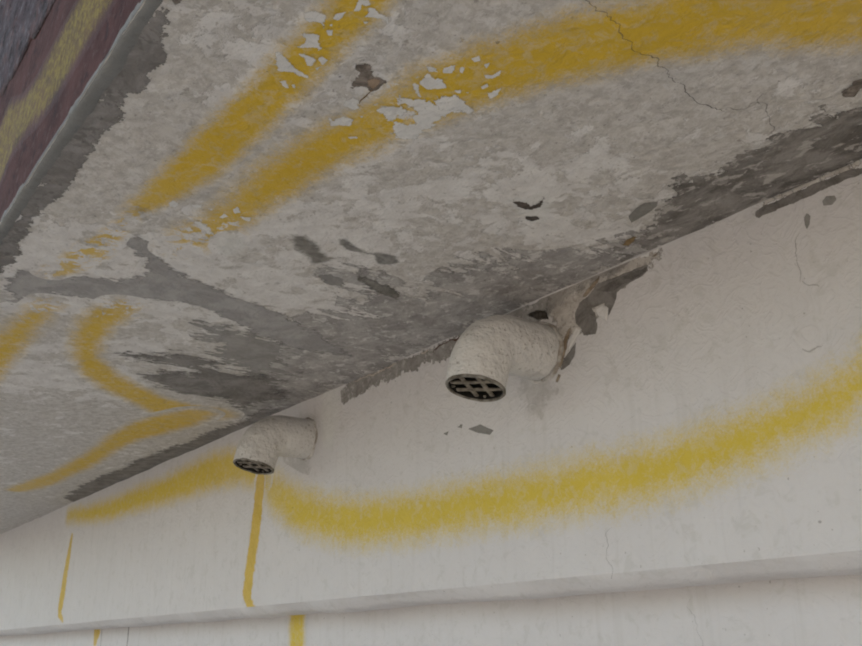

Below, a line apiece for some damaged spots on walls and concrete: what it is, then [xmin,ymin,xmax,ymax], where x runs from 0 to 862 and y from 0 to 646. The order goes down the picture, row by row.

peeling [0,0,862,425]
damp [288,233,401,286]
damp [357,276,399,299]